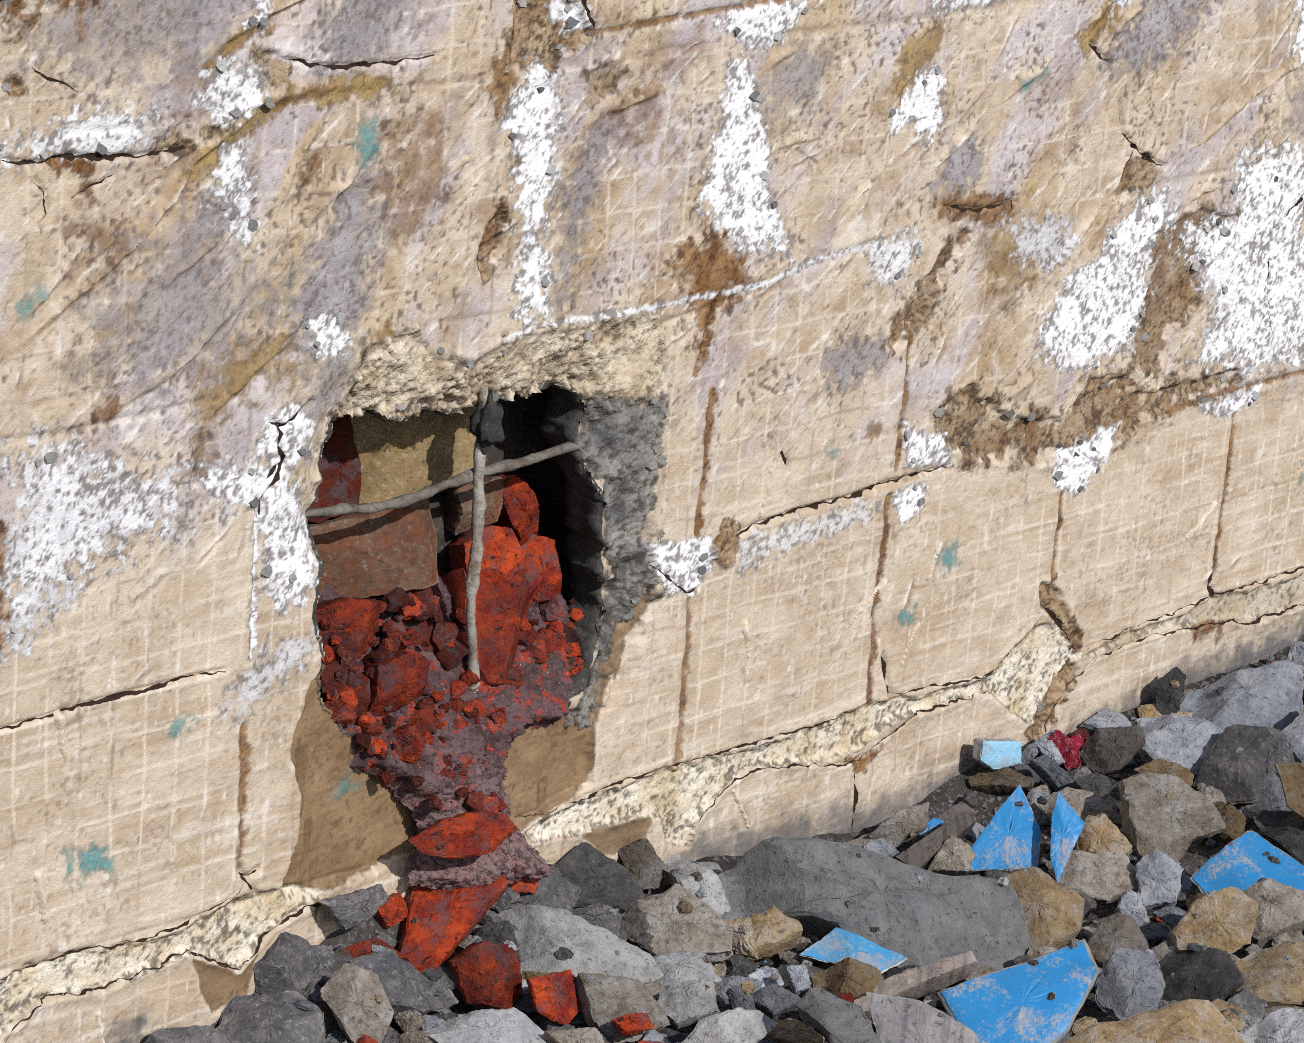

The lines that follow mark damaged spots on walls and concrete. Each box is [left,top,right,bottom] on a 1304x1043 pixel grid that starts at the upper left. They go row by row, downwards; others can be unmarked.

crack [288,54,434,70]
crack [1118,100,1162,166]
peeling [0,0,1304,739]
crack [258,406,303,515]
crack [0,671,226,729]
crack [515,565,1304,826]
crack [0,870,321,1043]